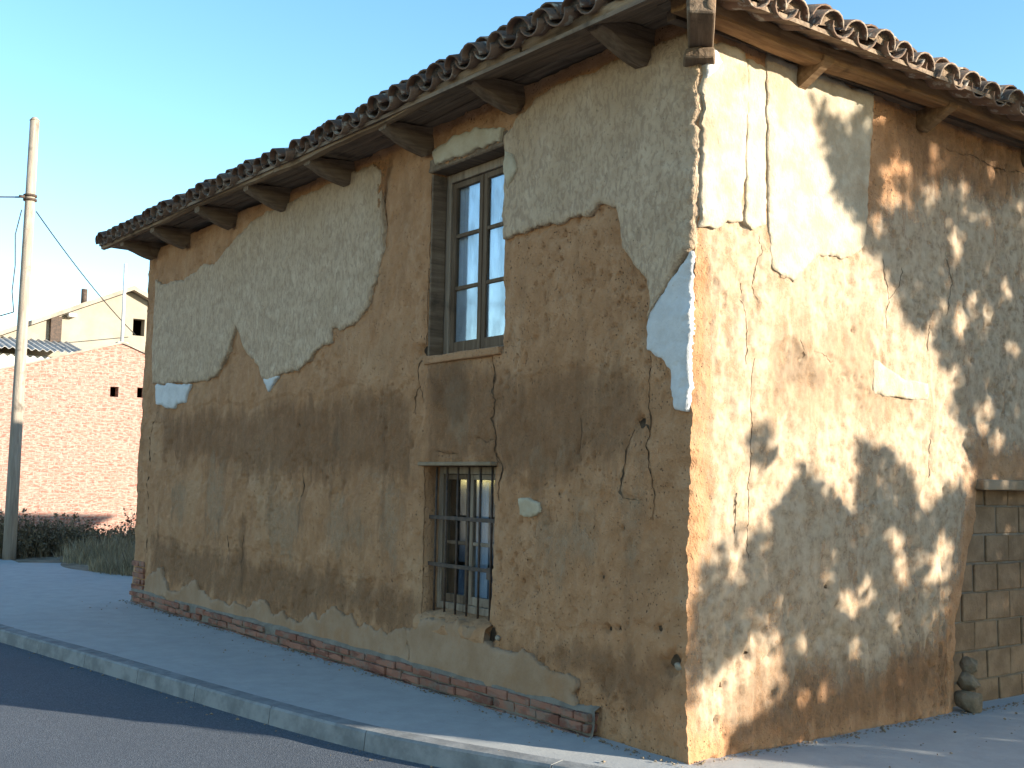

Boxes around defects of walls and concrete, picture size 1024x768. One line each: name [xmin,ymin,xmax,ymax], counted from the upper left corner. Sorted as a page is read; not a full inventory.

peeling [432,33,874,412]
crack [477,357,503,501]
crack [619,356,655,518]
crack [734,237,793,558]
spalling [144,567,580,706]